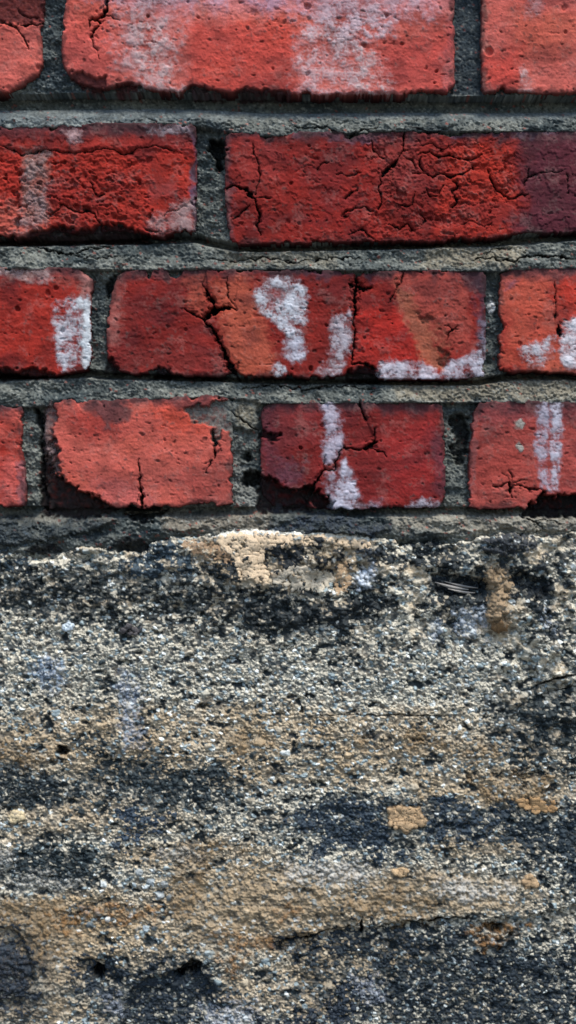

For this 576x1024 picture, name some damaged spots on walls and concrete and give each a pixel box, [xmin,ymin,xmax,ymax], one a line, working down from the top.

crack [228,150,266,228]
crack [301,126,568,237]
crack [187,256,402,496]
peeling [181,529,375,596]